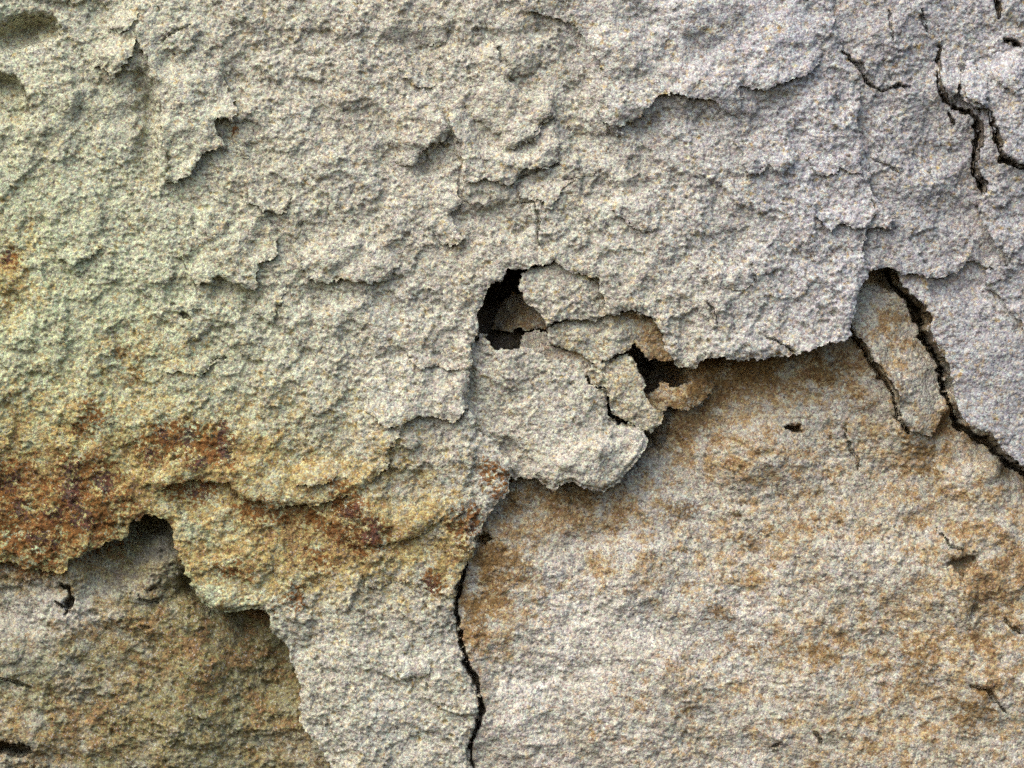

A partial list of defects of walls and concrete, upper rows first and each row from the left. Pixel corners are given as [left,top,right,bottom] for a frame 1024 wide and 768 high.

crack [841,51,911,92]
crack [920,8,1024,193]
crack [994,0,1021,47]
rust [0,398,143,582]
rust [133,417,244,507]
rust [225,476,394,575]
rust [476,456,608,515]
spalling [456,324,1024,768]
spalling [862,267,933,323]
crack [884,269,1024,476]
spalling [0,514,331,768]
crack [455,566,485,768]